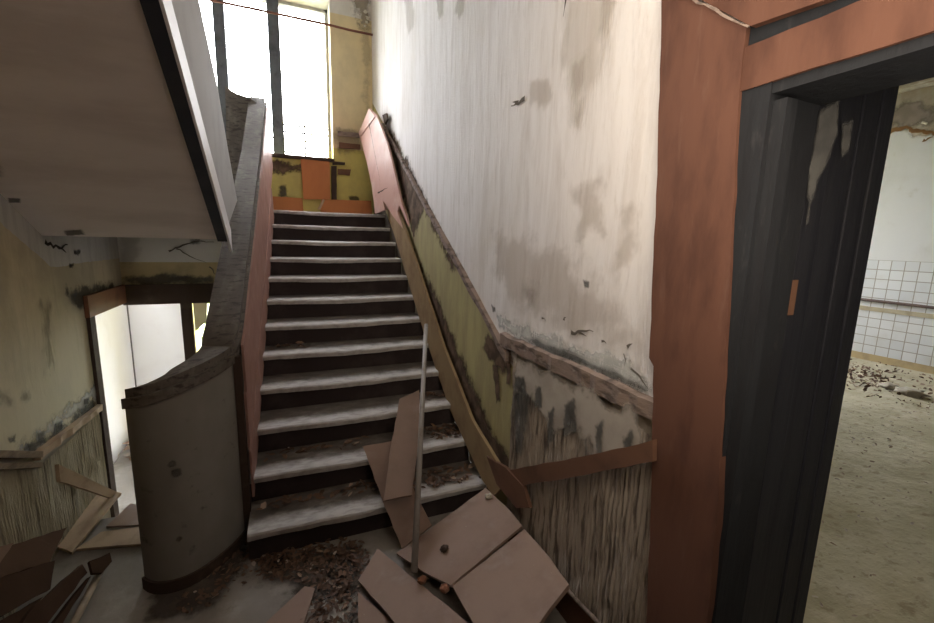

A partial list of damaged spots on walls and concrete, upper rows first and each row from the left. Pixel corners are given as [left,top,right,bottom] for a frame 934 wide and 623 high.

peeling [352,0,370,29]
flaking render [891,86,934,142]
leakage [388,129,457,269]
leakage [418,262,554,467]
leakage [520,339,646,391]
leakage [25,398,95,451]
leakage [564,400,576,436]